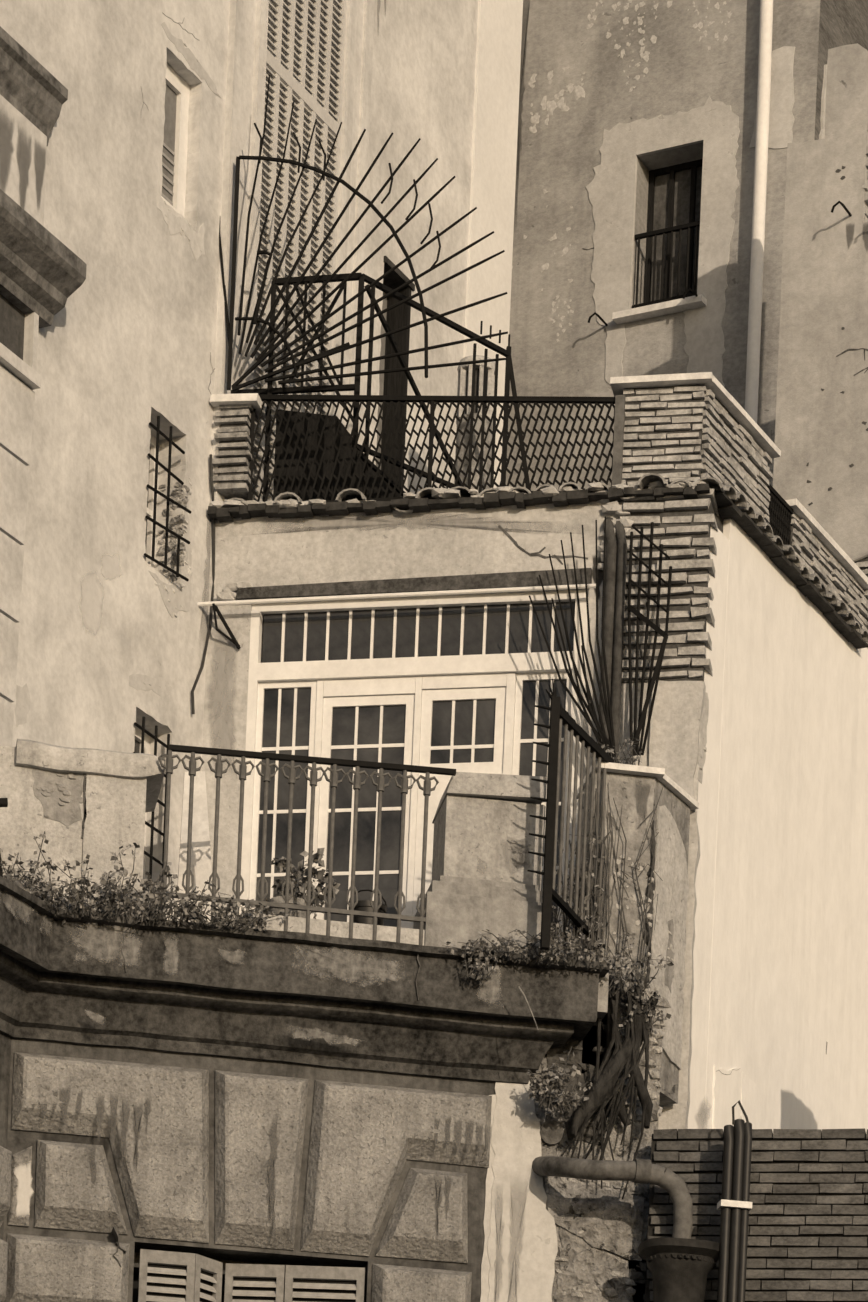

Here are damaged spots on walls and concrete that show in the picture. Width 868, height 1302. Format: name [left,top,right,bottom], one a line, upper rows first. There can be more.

peeling [586,0,672,92]
damp [515,7,528,207]
peeling [528,67,585,133]
corrosion [847,225,868,249]
crack [836,348,868,376]
spalling [149,457,193,618]
flaking render [216,581,252,601]
spalling [32,768,83,827]
damp [69,922,141,966]
damp [293,945,399,987]
damp [291,1025,358,1046]
damp [32,1089,151,1184]